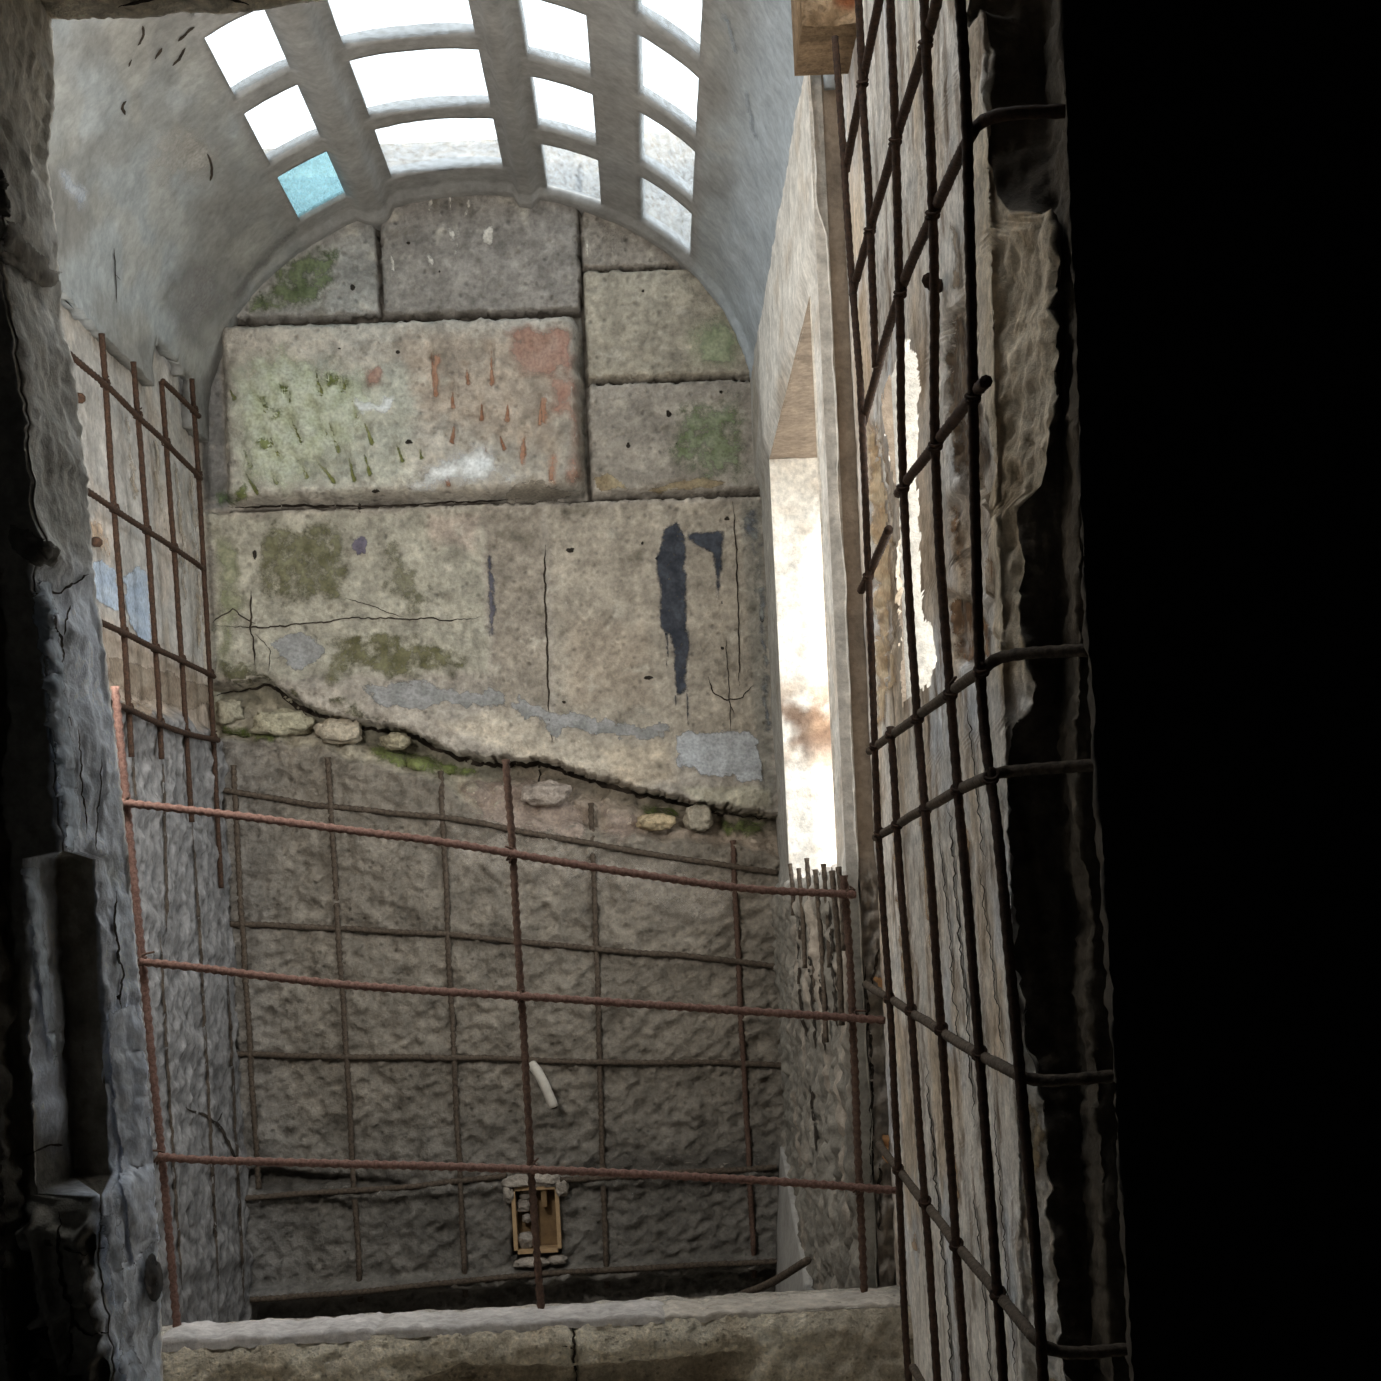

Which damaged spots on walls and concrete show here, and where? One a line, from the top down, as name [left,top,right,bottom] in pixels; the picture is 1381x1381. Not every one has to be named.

flaking render [155,27,195,66]
water stain [355,398,392,412]
corrosion [511,327,577,442]
water stain [418,450,492,486]
crack [213,545,767,820]
spalling [831,0,1128,1381]
spalling [70,333,846,1315]
crack [563,1328,577,1381]